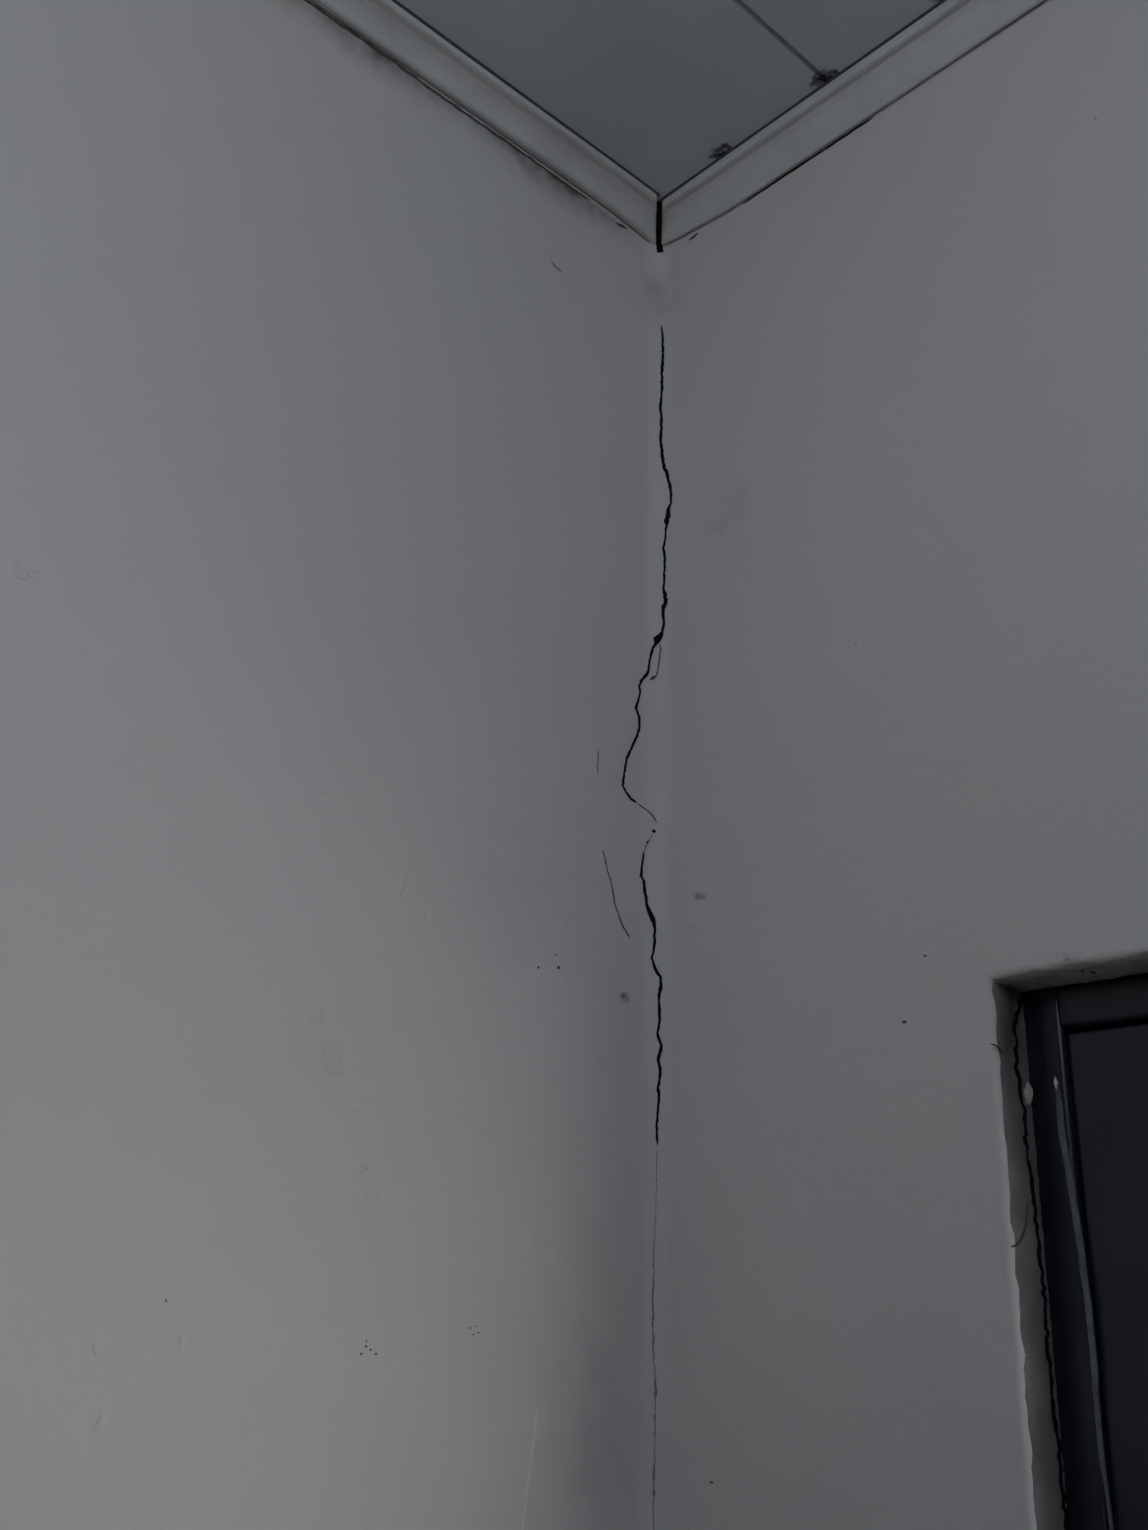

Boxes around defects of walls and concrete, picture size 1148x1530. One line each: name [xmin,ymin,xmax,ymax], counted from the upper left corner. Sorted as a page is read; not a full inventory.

crack [597,326,673,1530]